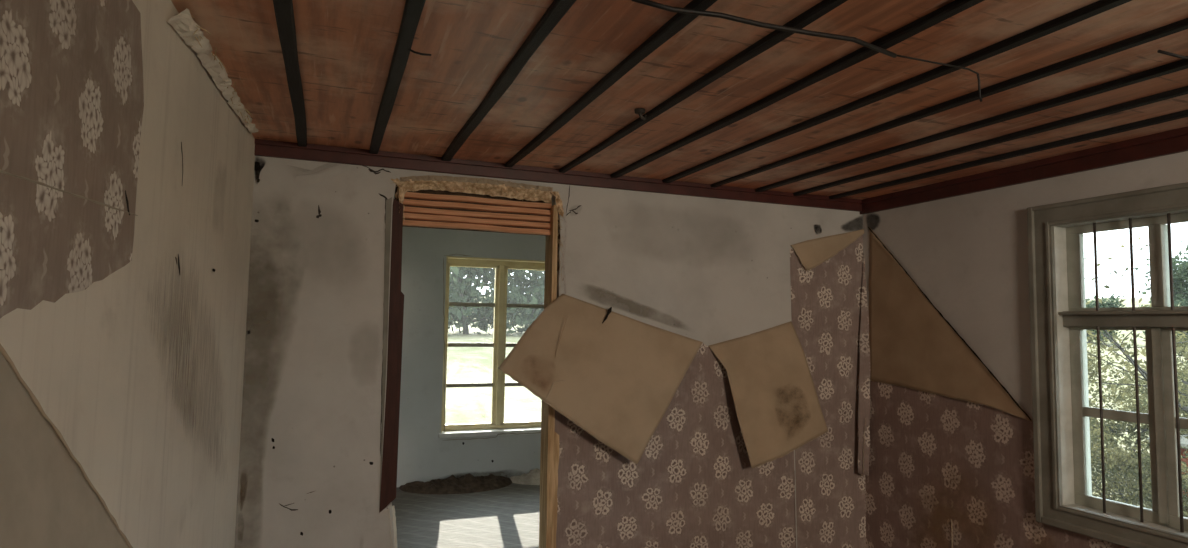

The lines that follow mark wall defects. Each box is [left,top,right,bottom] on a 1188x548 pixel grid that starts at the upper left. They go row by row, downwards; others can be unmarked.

flaking render [168,8,259,133]